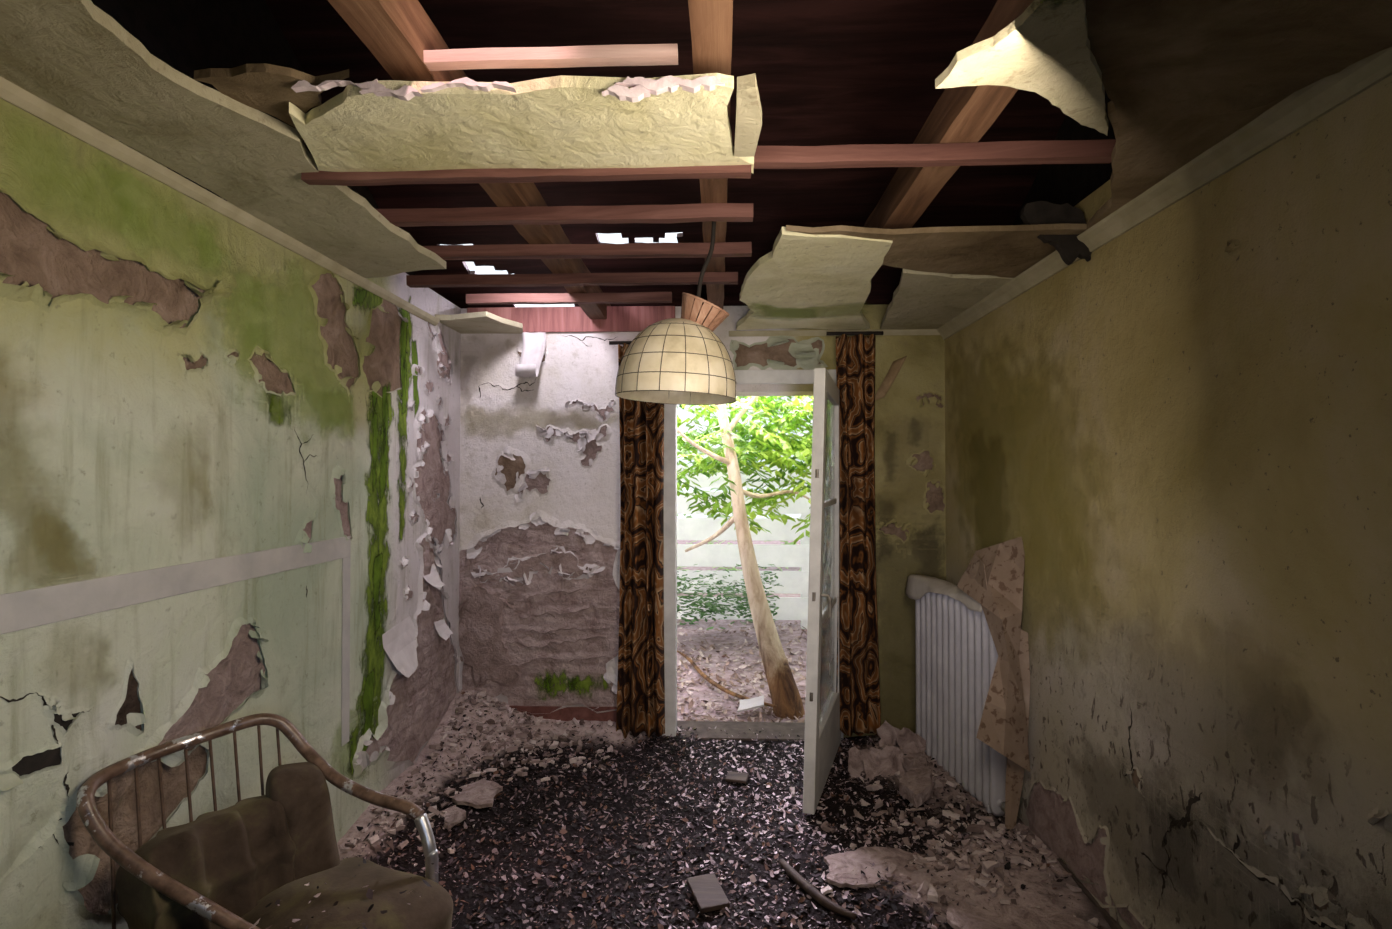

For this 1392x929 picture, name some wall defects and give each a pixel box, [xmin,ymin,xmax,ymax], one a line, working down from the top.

peeling [0,187,233,336]
spalling [308,270,620,779]
crack [0,691,94,883]
peeling [56,790,125,924]
peeling [95,617,269,852]
crack [1123,708,1140,782]
crack [1141,814,1349,929]